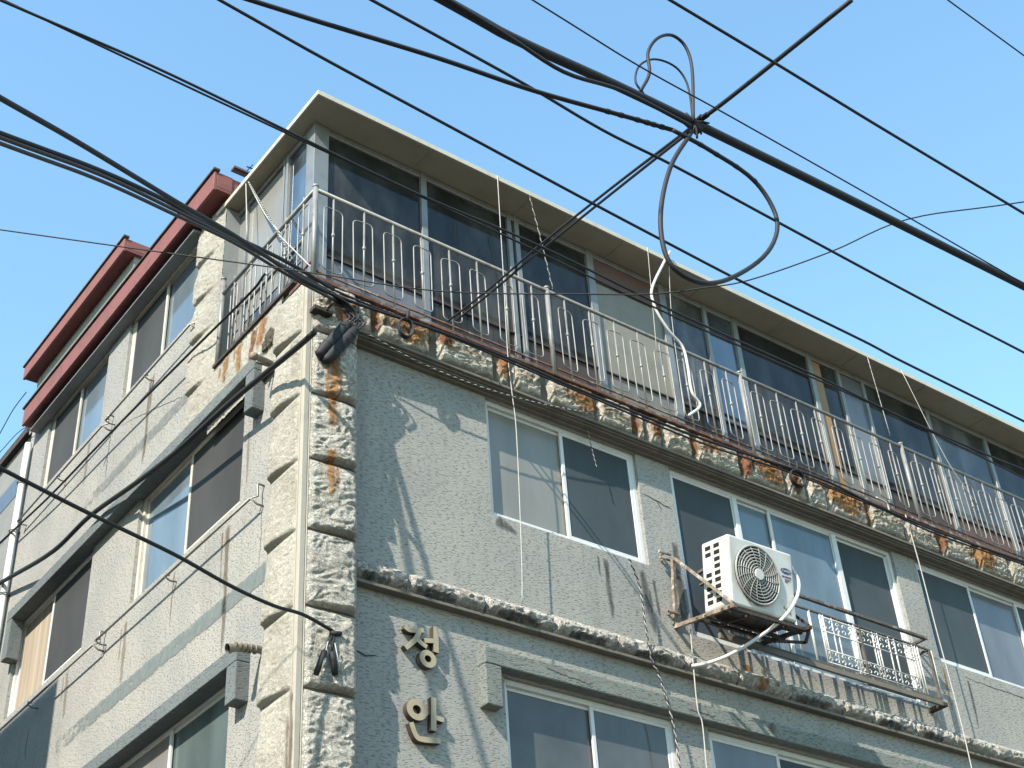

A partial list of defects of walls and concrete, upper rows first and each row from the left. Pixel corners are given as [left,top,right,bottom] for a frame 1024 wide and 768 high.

corrosion [371,310,453,346]
corrosion [218,317,267,381]
corrosion [325,357,342,425]
corrosion [567,384,596,412]
corrosion [630,412,662,440]
corrosion [689,436,719,456]
corrosion [326,449,339,493]
corrosion [738,454,803,493]
corrosion [829,489,871,526]
corrosion [970,547,996,569]
leakage [220,528,229,642]